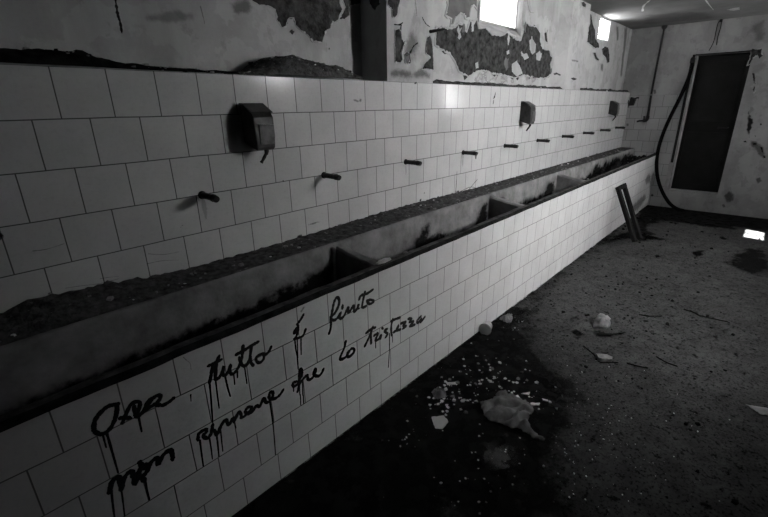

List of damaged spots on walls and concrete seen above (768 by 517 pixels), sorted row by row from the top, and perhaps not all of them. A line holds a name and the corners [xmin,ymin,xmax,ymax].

crack [114,0,123,33]
flaking render [251,0,401,43]
flaking render [394,28,410,64]
flaking render [421,0,553,81]
flaking render [581,1,610,64]